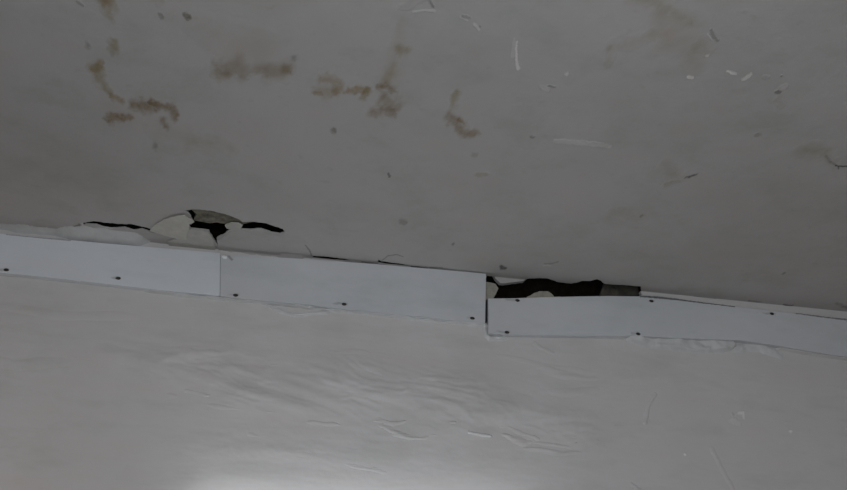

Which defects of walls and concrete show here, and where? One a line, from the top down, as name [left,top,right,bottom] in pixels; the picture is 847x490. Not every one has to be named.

water stain [84,0,243,163]
water stain [148,0,301,88]
water stain [309,11,414,121]
water stain [442,87,483,141]
flaking render [150,209,305,261]
flaking render [485,276,641,323]